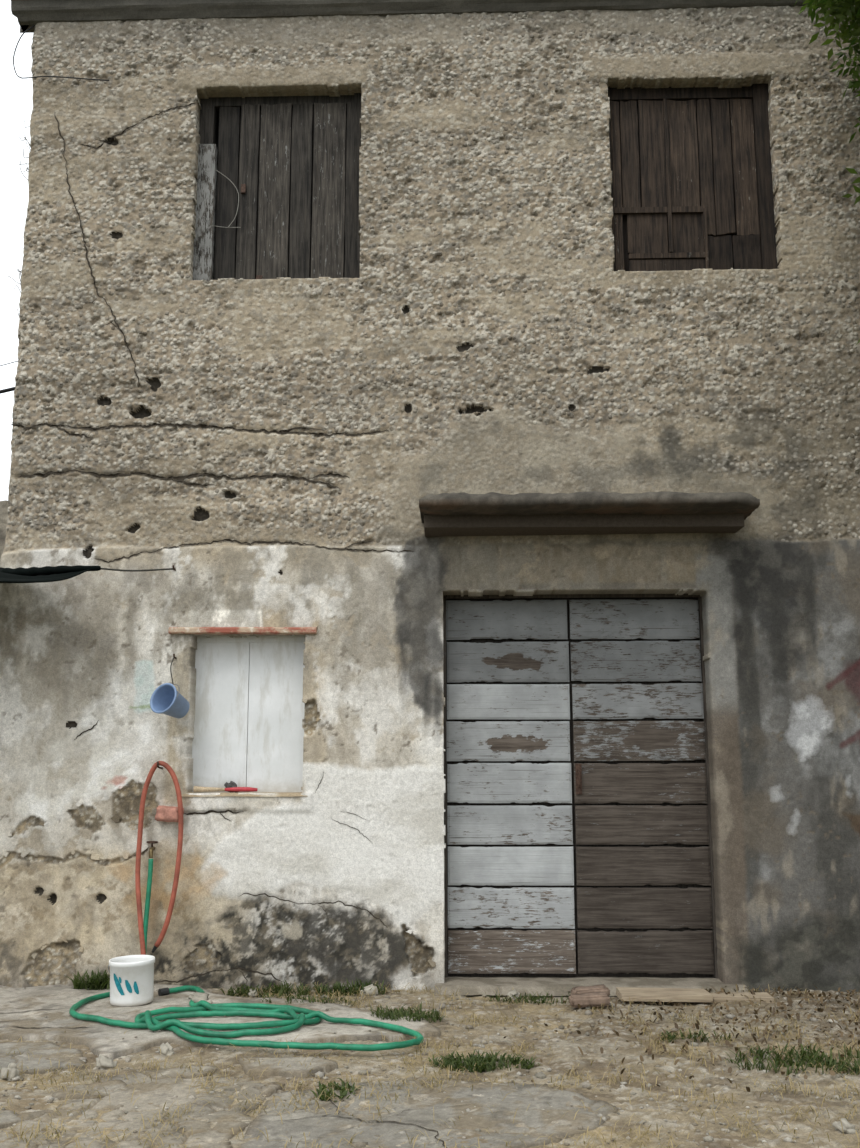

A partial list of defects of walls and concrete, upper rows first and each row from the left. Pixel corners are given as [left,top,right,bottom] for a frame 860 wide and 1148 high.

crack [11,422,388,438]
crack [19,469,349,488]
spalling [302,699,321,737]
peeling [7,673,161,837]
flaking render [0,845,149,869]
damp [0,937,34,988]
spalling [21,937,84,986]
damp [138,887,438,991]
spalling [402,924,436,978]